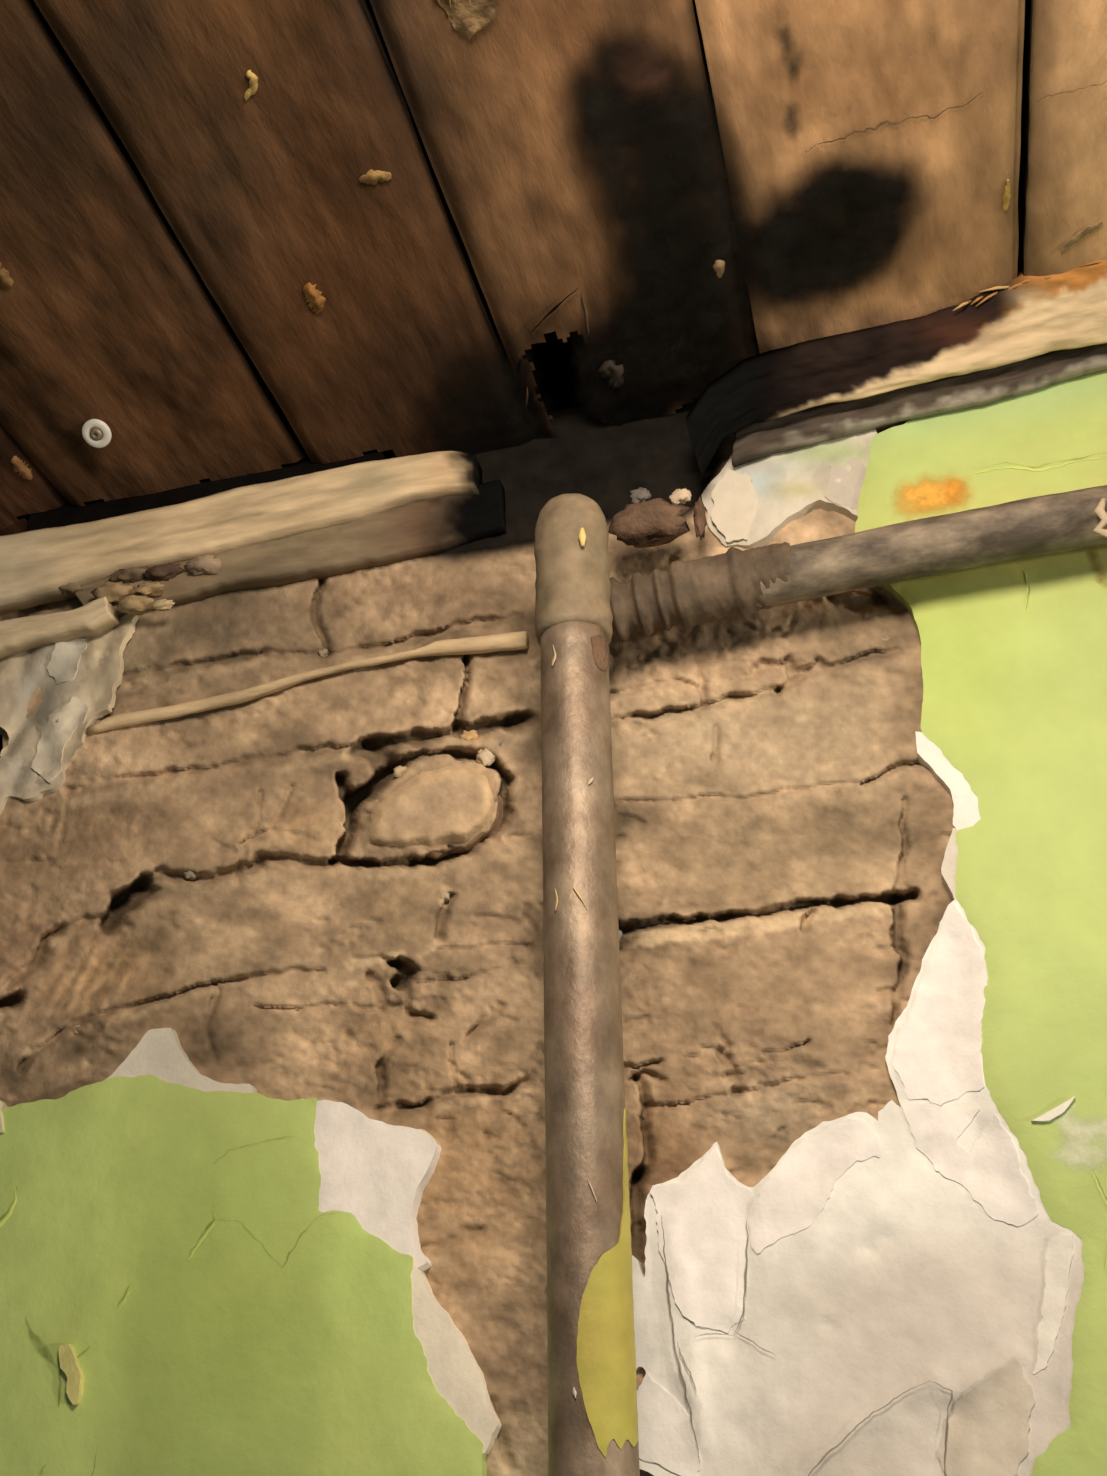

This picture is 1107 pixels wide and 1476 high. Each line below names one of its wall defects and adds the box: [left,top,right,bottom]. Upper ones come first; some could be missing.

crack [810,91,983,150]
rust [900,479,968,512]
spalling [0,545,548,1476]
spalling [609,586,1084,1476]